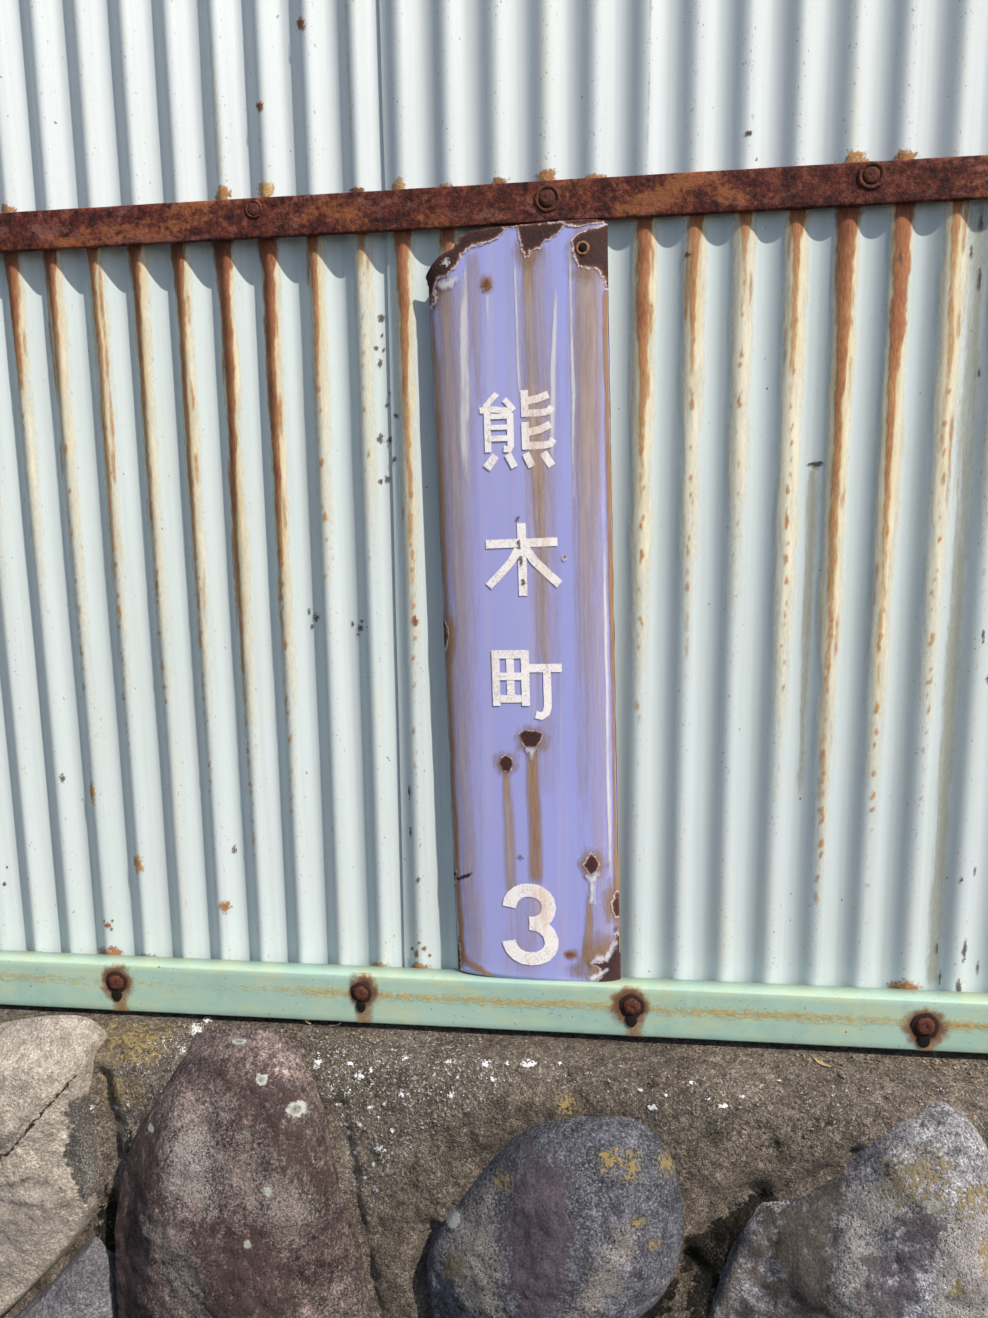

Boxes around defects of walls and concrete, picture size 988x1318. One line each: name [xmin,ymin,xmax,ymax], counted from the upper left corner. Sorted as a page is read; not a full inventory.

rust [0,149,988,823]
rust [97,945,133,1011]
rust [245,962,988,1051]
crack [0,1075,77,1189]